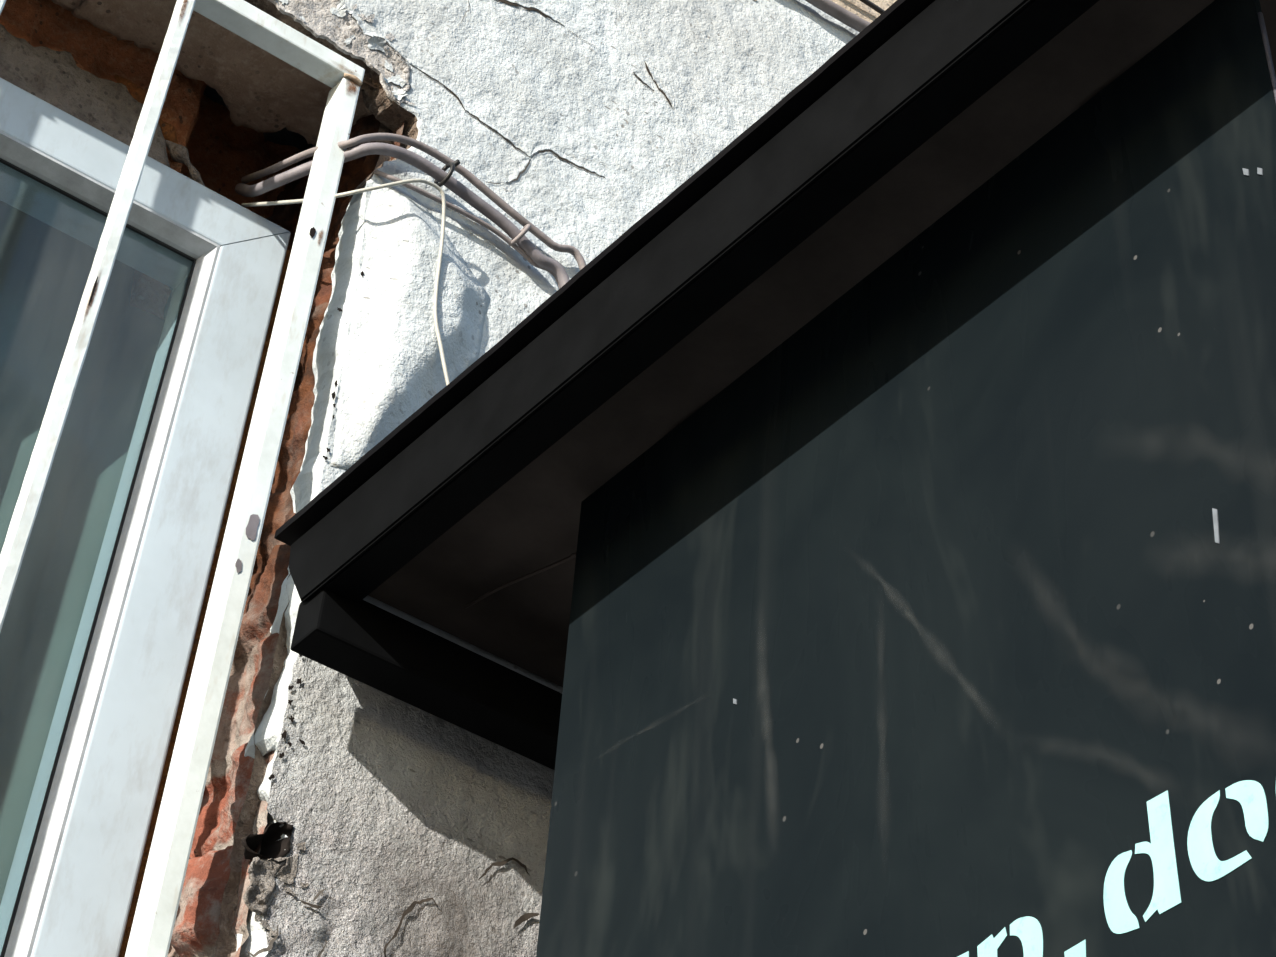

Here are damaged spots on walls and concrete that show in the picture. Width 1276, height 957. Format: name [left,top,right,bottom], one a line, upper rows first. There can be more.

spalling [268,0,417,107]
crack [342,0,604,184]
spalling [279,678,305,758]
spalling [243,822,309,943]
crack [383,897,440,957]
crack [478,857,530,880]
crack [514,913,539,929]